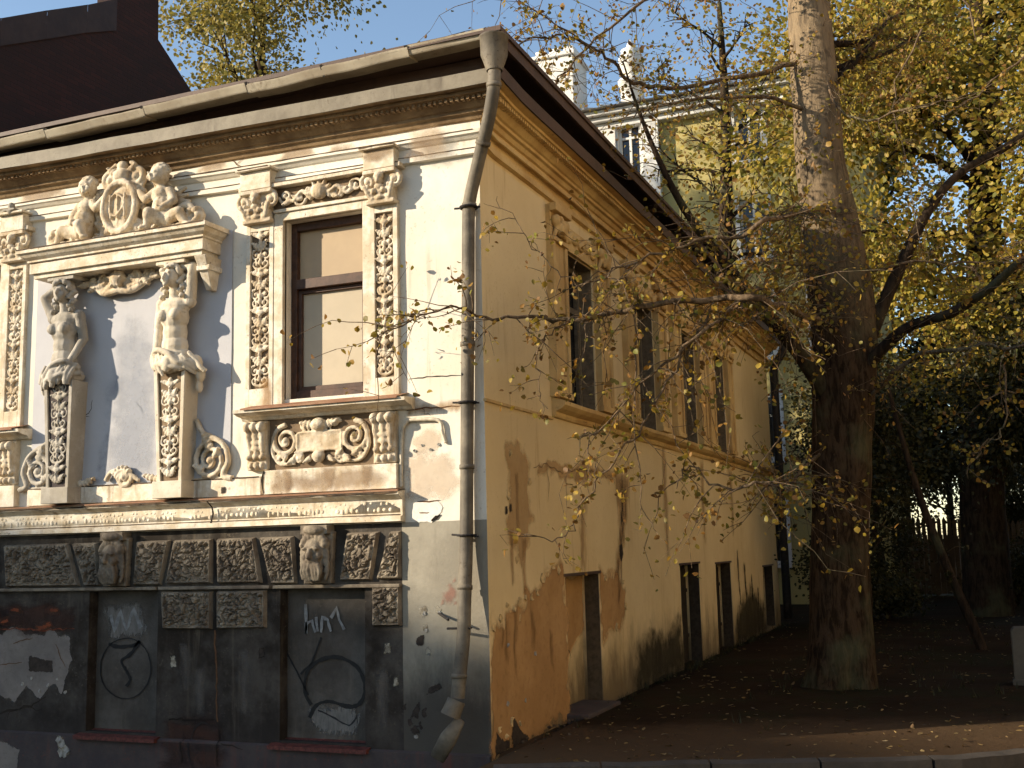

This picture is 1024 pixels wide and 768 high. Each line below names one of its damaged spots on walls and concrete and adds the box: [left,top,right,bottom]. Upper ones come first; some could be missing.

flaking render [600,572,627,641]
flaking render [491,563,584,759]
damp [636,619,684,691]